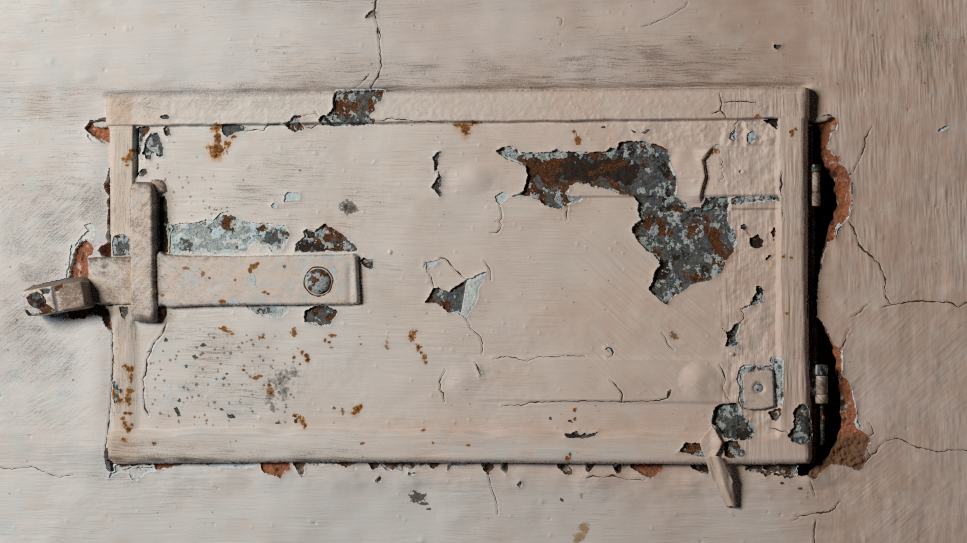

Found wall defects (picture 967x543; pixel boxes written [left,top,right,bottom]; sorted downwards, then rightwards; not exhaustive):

crack [354,0,382,89]
rust [206,122,236,158]
peeling [318,89,386,127]
peeling [159,196,374,269]
peeling [495,129,780,305]
spalling [810,114,854,298]
crack [840,221,967,349]
rust [112,364,134,442]
spalling [711,317,871,479]
spalling [204,462,509,483]
crack [865,423,967,462]
crack [794,482,841,543]